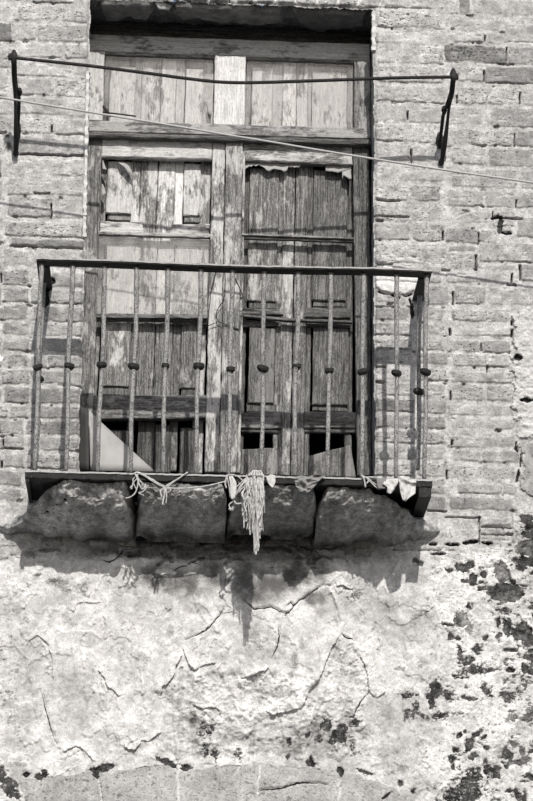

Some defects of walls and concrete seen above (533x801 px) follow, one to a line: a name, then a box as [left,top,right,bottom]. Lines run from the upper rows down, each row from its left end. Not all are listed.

crack [287,543,340,561]
spalling [429,540,493,556]
damp [142,561,323,602]
crack [247,585,330,658]
flaking render [441,514,533,701]
flaking render [401,679,451,721]
flaking render [505,706,533,722]
flaking render [0,767,49,800]
crack [258,782,328,792]
flaking render [443,730,533,801]